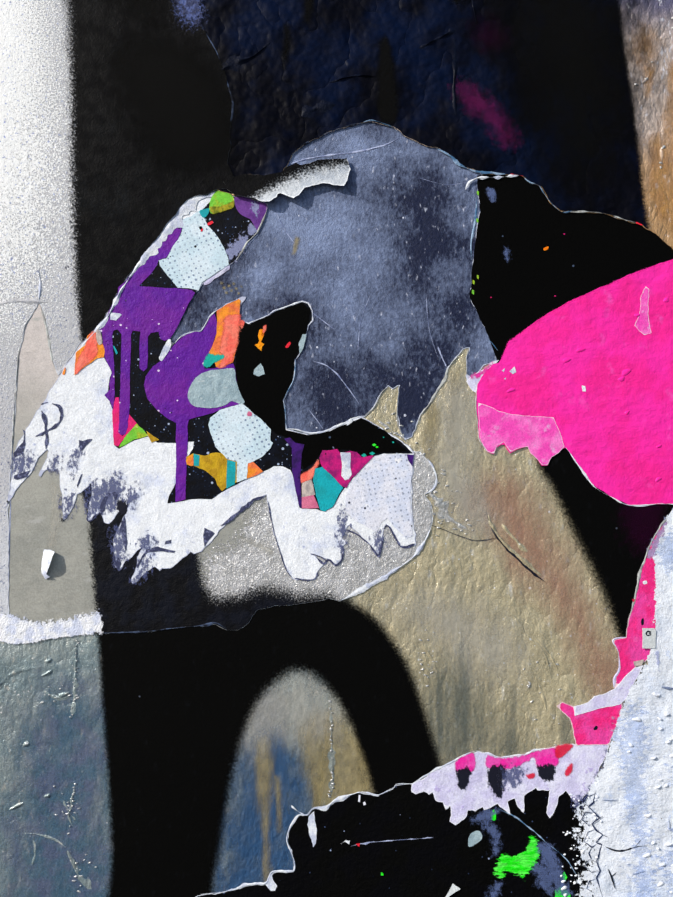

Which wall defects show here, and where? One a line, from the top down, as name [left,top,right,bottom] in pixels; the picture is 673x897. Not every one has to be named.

peeling [378,404,431,460]
crack [432,512,545,582]